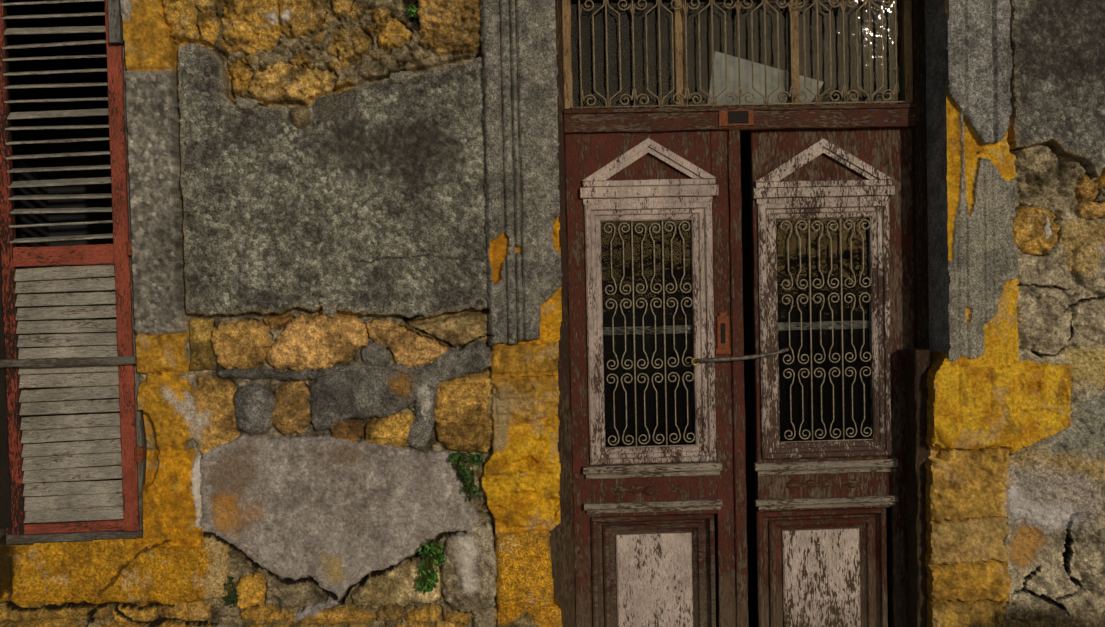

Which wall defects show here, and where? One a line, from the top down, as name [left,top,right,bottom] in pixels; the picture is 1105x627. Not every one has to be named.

spalling [162,0,484,110]
spalling [946,80,1105,262]
peeling [490,233,522,285]
peeling [553,217,561,253]
peeling [944,278,1019,361]
spalling [184,287,562,461]
crack [0,540,219,627]
spalling [203,507,563,627]
crack [1011,513,1087,616]